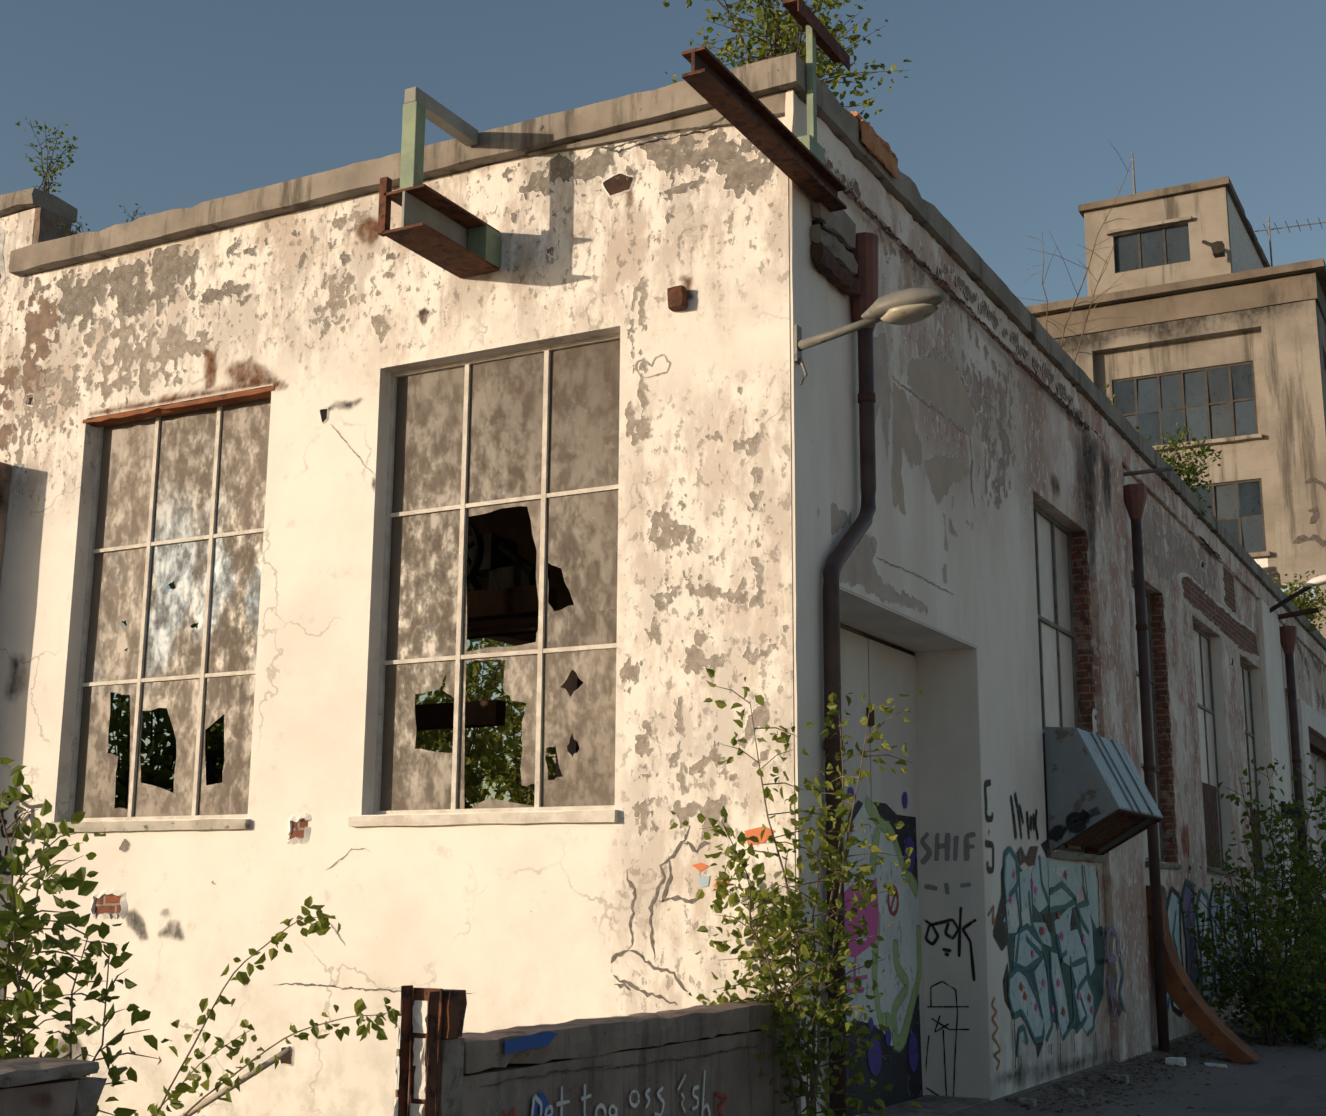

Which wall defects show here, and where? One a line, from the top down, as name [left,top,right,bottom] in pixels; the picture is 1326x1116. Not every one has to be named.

peeling [0,227,252,474]
peeling [311,210,371,340]
rust [356,219,378,243]
peeling [623,275,651,447]
peeling [501,127,777,224]
peeling [810,199,1089,584]
peeling [643,418,766,675]
flaking render [1142,499,1261,668]
peeling [632,696,738,841]
crack [279,983,401,993]
crack [326,848,369,870]
crack [611,826,709,1005]